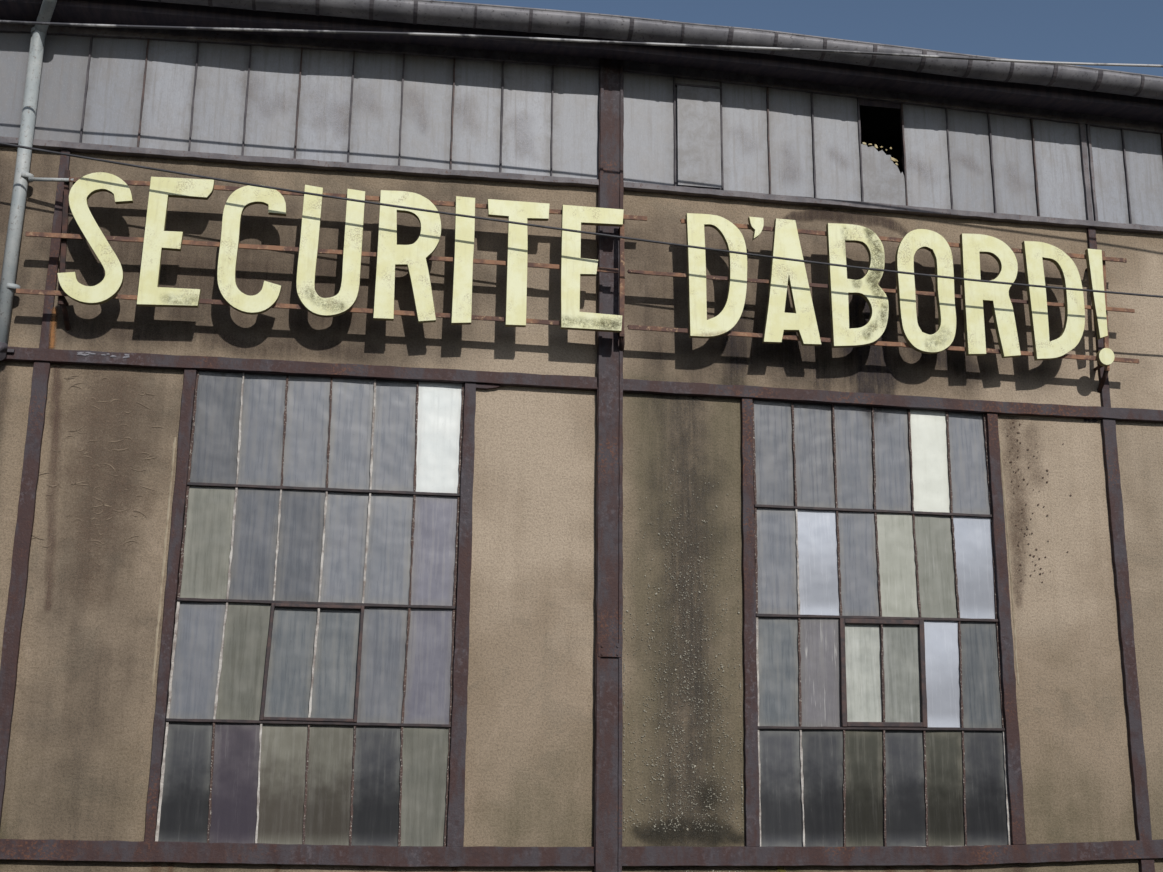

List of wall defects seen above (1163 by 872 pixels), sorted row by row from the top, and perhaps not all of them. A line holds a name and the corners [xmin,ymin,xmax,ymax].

water stain [623,407,745,846]